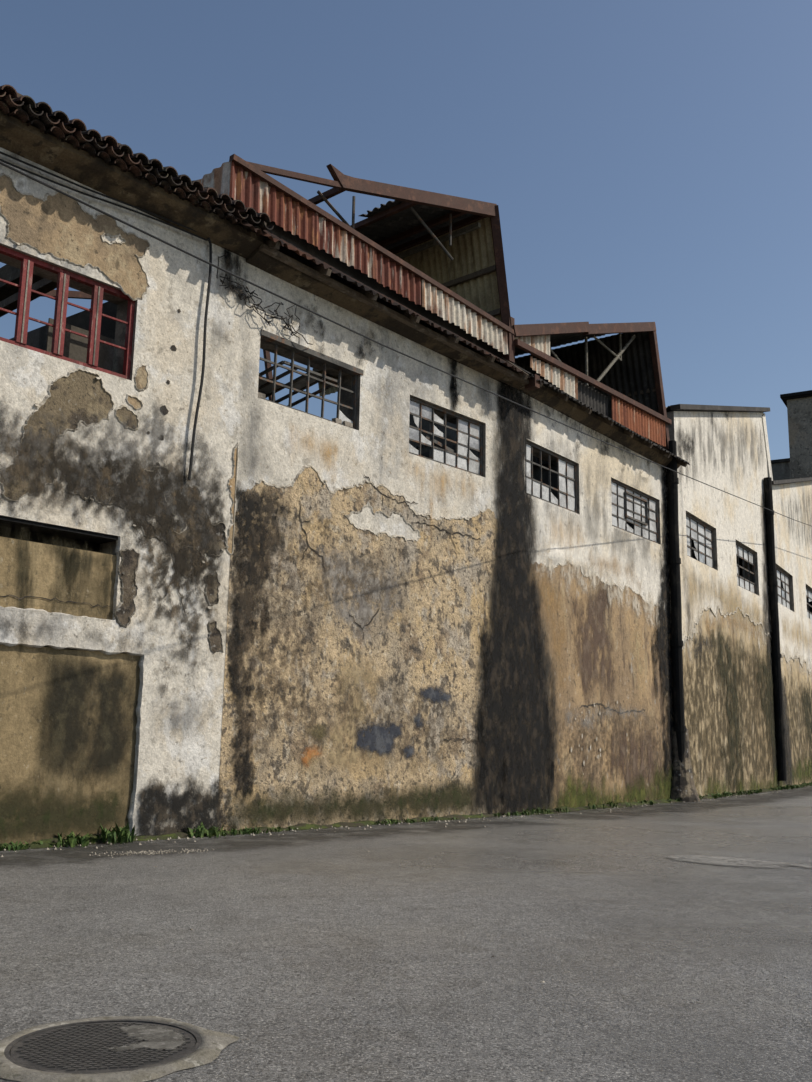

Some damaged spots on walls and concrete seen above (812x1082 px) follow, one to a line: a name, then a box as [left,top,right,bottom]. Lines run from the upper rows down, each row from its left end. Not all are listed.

peeling [0,173,151,301]
leakage [0,405,290,802]
peeling [0,364,812,835]
leakage [473,380,812,815]
leakage [138,775,235,836]